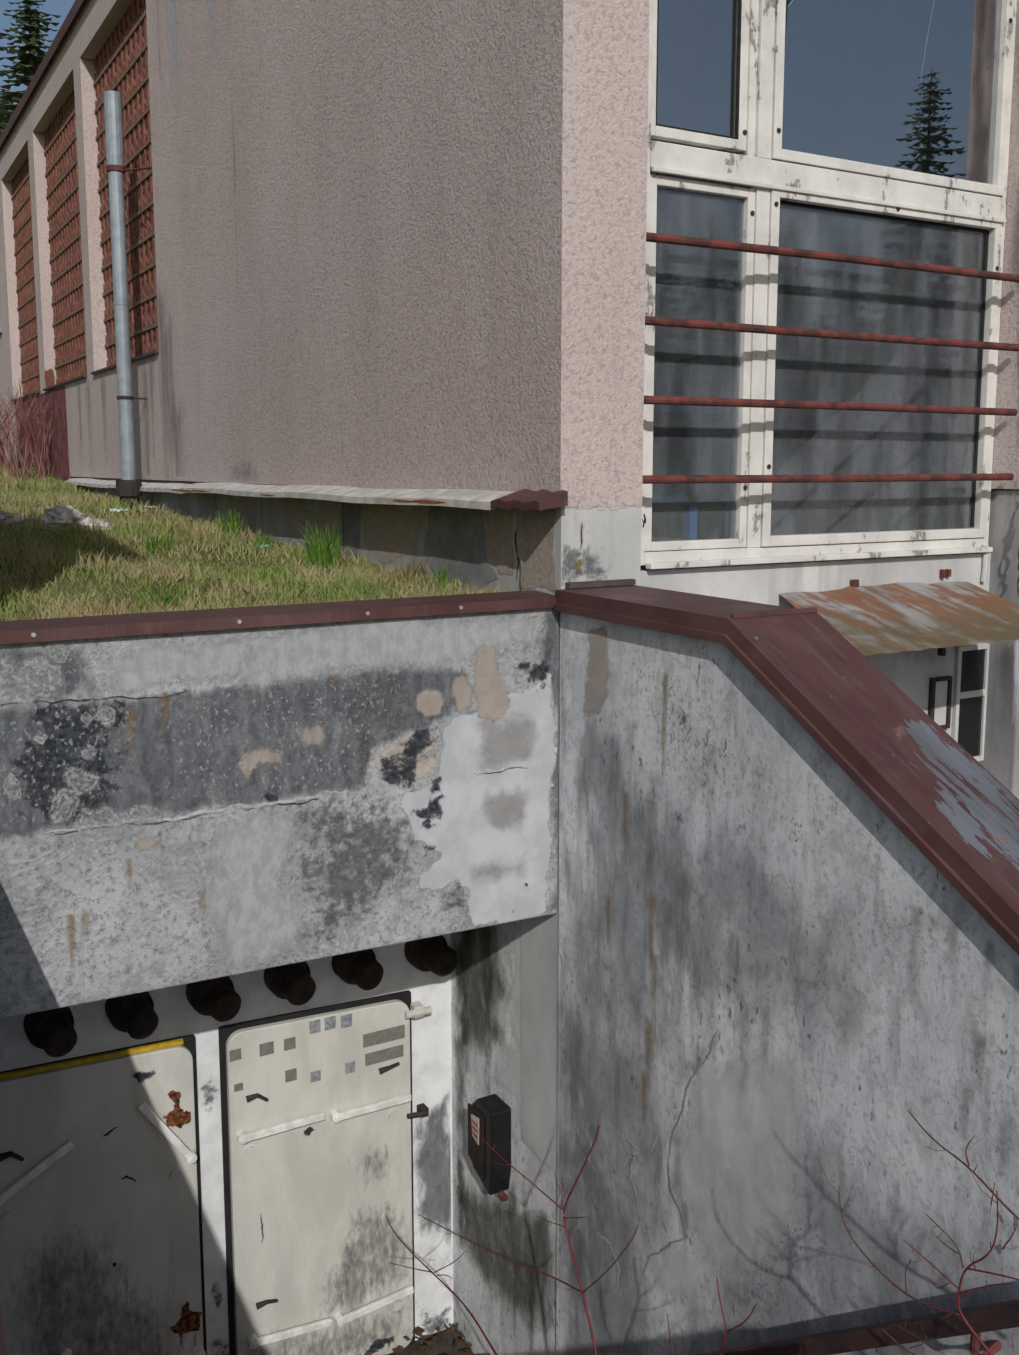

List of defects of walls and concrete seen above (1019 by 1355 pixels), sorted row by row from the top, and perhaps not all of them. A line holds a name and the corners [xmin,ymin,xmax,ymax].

peeling [583,628,609,714]
peeling [238,748,284,777]
peeling [297,724,324,746]
peeling [363,644,557,926]
peeling [903,719,1019,871]
rust [163,1090,191,1129]
crack [643,1028,719,1274]
rust [170,1301,202,1345]